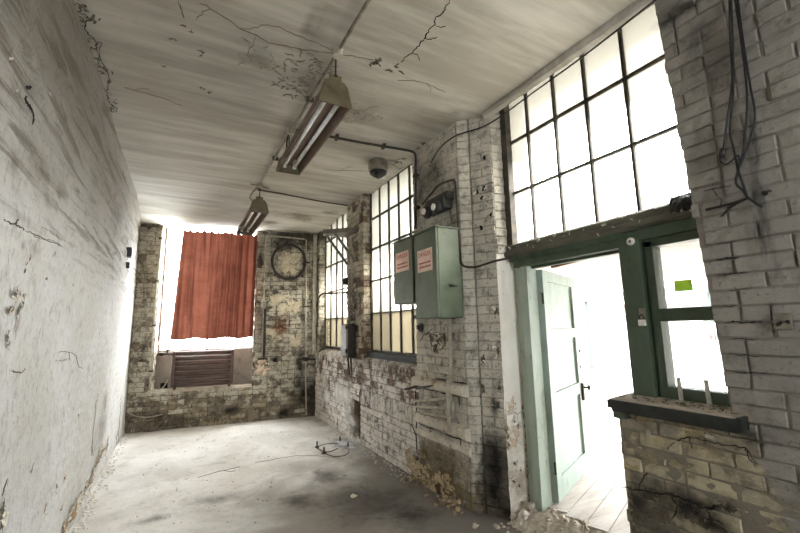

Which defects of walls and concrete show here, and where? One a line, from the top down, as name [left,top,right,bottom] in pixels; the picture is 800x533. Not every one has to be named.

crack [79,12,182,112]
crack [398,0,450,93]
crack [4,219,64,248]
flaking render [266,289,303,347]
flaking render [254,354,280,376]
flaking render [492,385,528,452]
spalling [404,448,462,510]
crack [624,472,677,521]
crack [667,436,758,467]
crack [702,504,742,525]